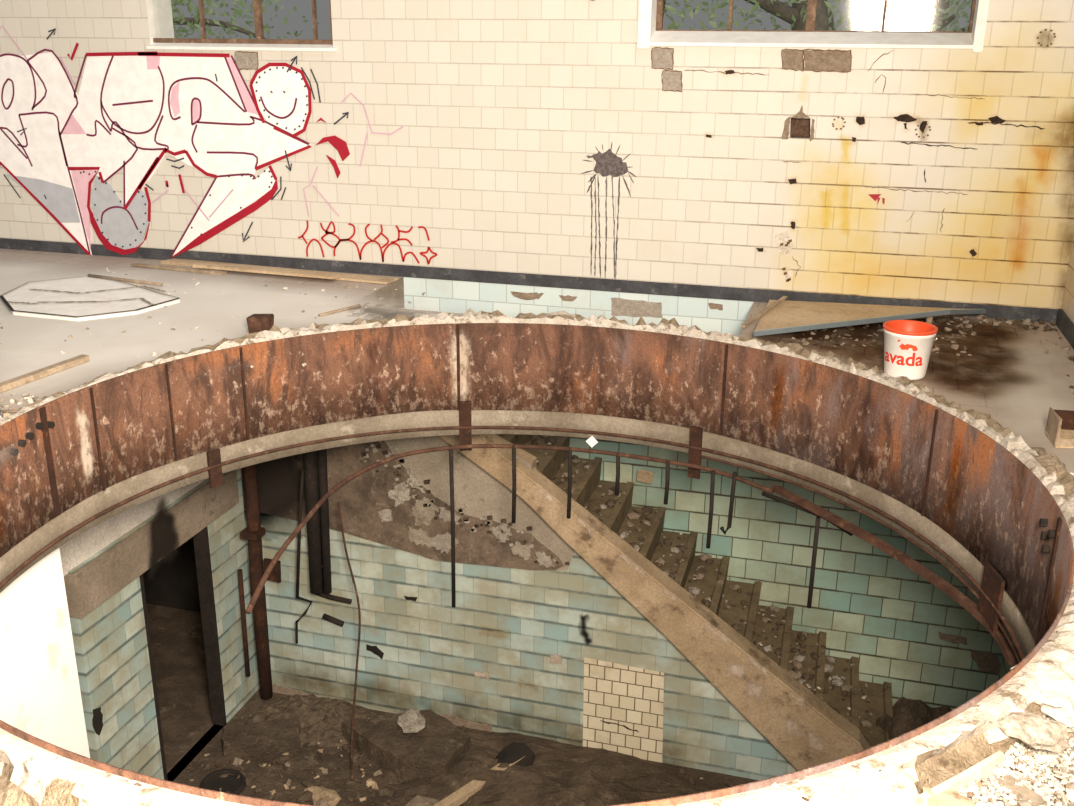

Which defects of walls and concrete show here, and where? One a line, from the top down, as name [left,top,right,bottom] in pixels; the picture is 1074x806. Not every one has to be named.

peeling [651,47,683,92]
peeling [781,49,852,73]
spalling [782,106,815,141]
peeling [611,298,662,318]
rust [77,411,92,476]
spalling [59,435,798,806]
spalling [998,654,1019,680]